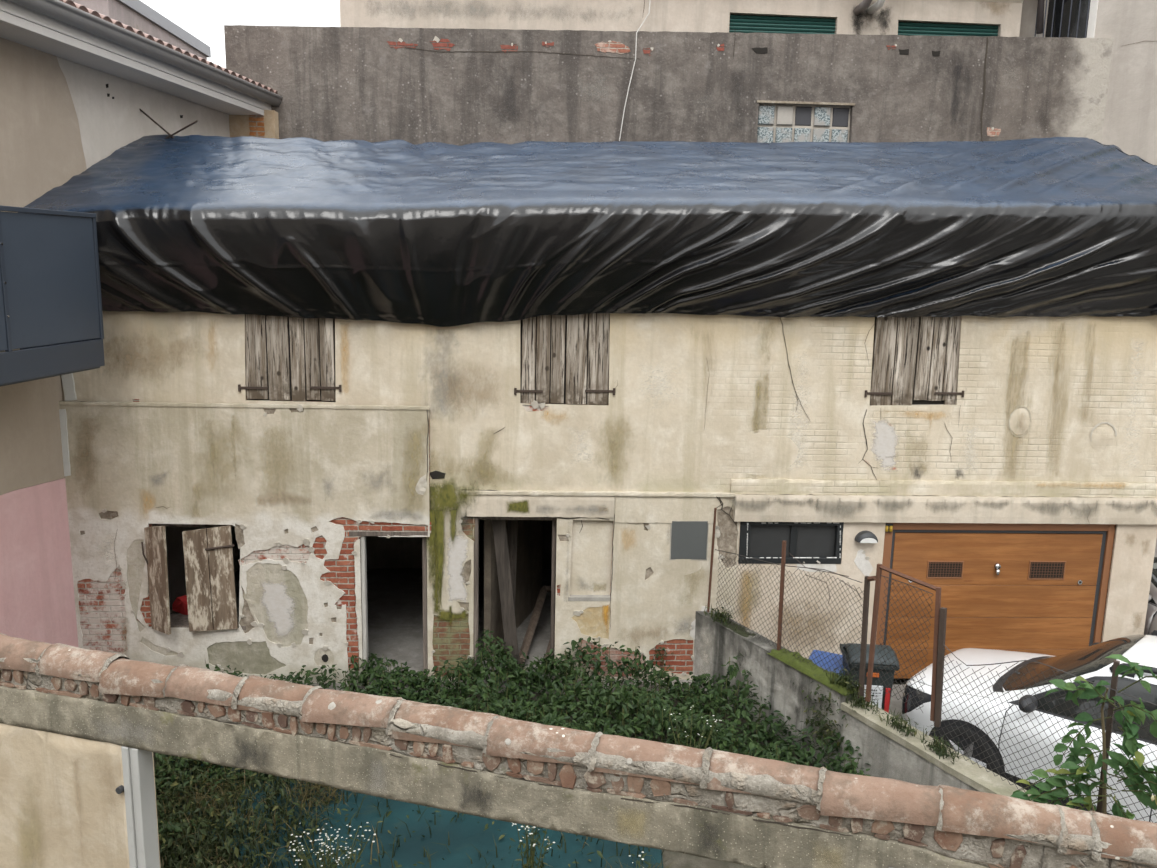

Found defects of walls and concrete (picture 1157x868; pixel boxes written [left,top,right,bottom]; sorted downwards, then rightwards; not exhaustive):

crack [860,408,897,480]
leakage [817,504,861,515]
flaking render [77,539,185,657]
peeling [207,517,431,675]
flaking render [572,606,711,679]